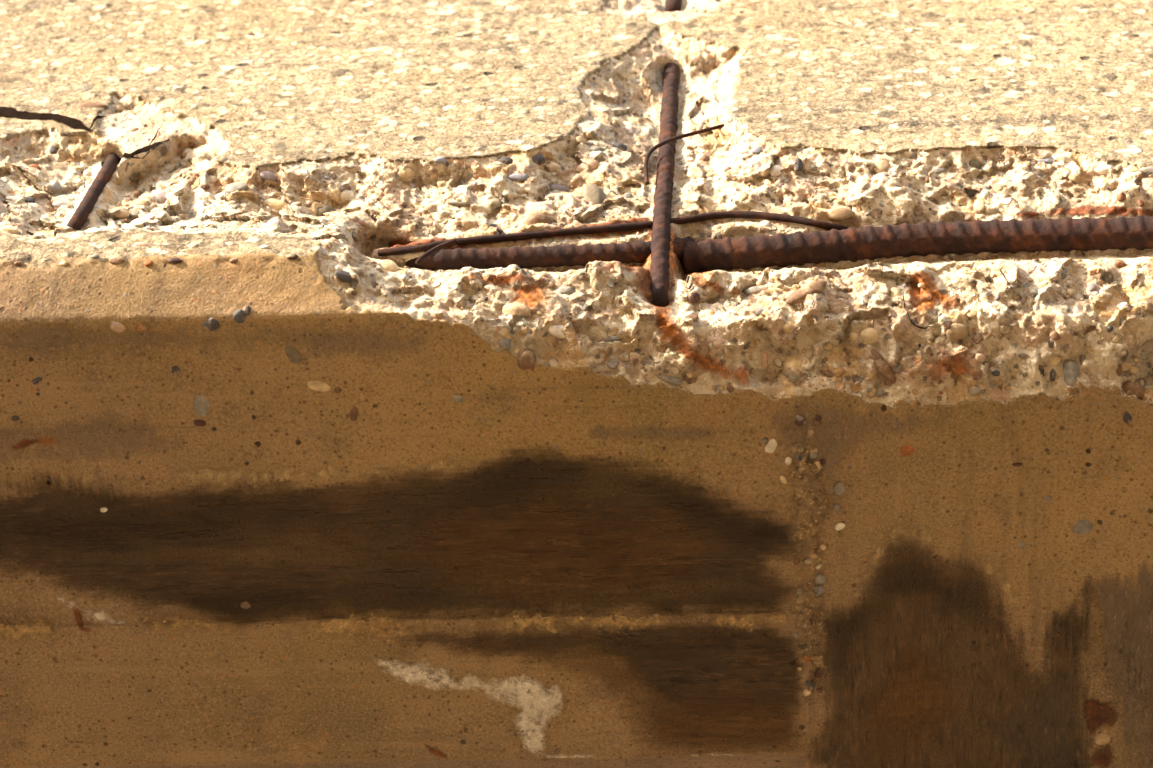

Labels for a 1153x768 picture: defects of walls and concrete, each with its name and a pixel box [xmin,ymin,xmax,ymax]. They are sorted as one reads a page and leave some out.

crack [0,107,106,131]
crack [101,125,170,167]
spalling [0,0,1153,408]
corrosion [1015,205,1153,218]
corrosion [388,237,500,249]
corrosion [490,274,542,307]
corrosion [540,217,749,383]
corrosion [909,271,955,311]
water stain [0,454,801,751]
water stain [814,535,1153,768]